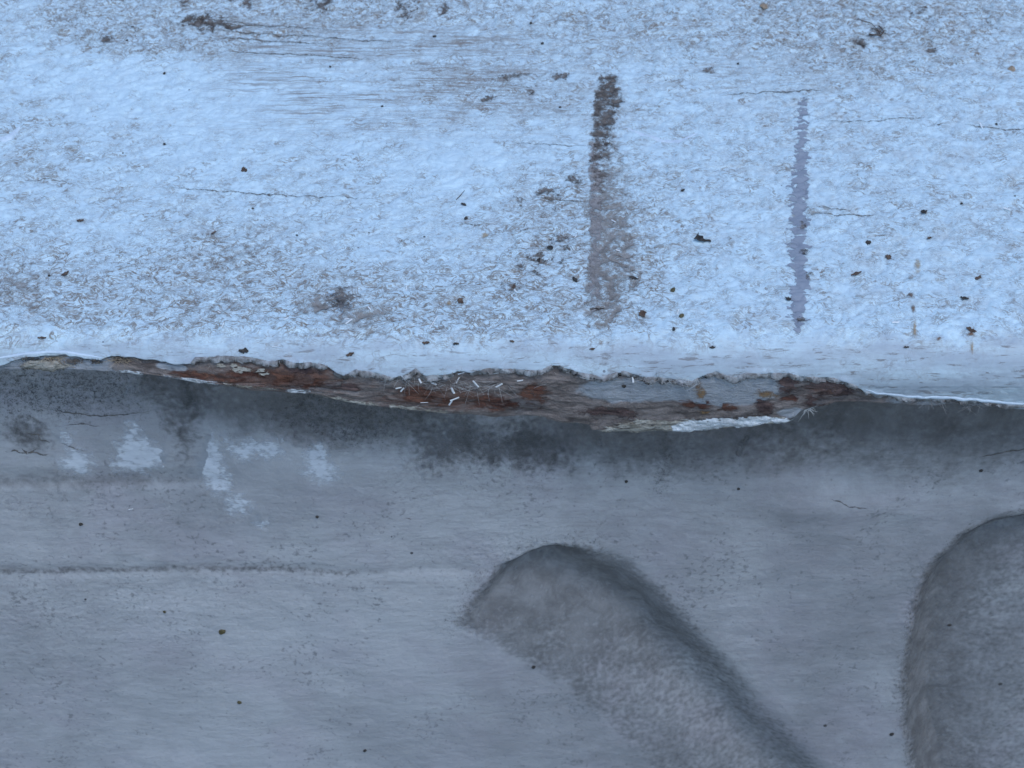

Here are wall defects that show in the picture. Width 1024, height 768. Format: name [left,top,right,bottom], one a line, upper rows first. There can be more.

damp [584,72,640,330]
damp [0,369,781,528]
spalling [0,348,1024,433]
damp [814,402,1024,449]